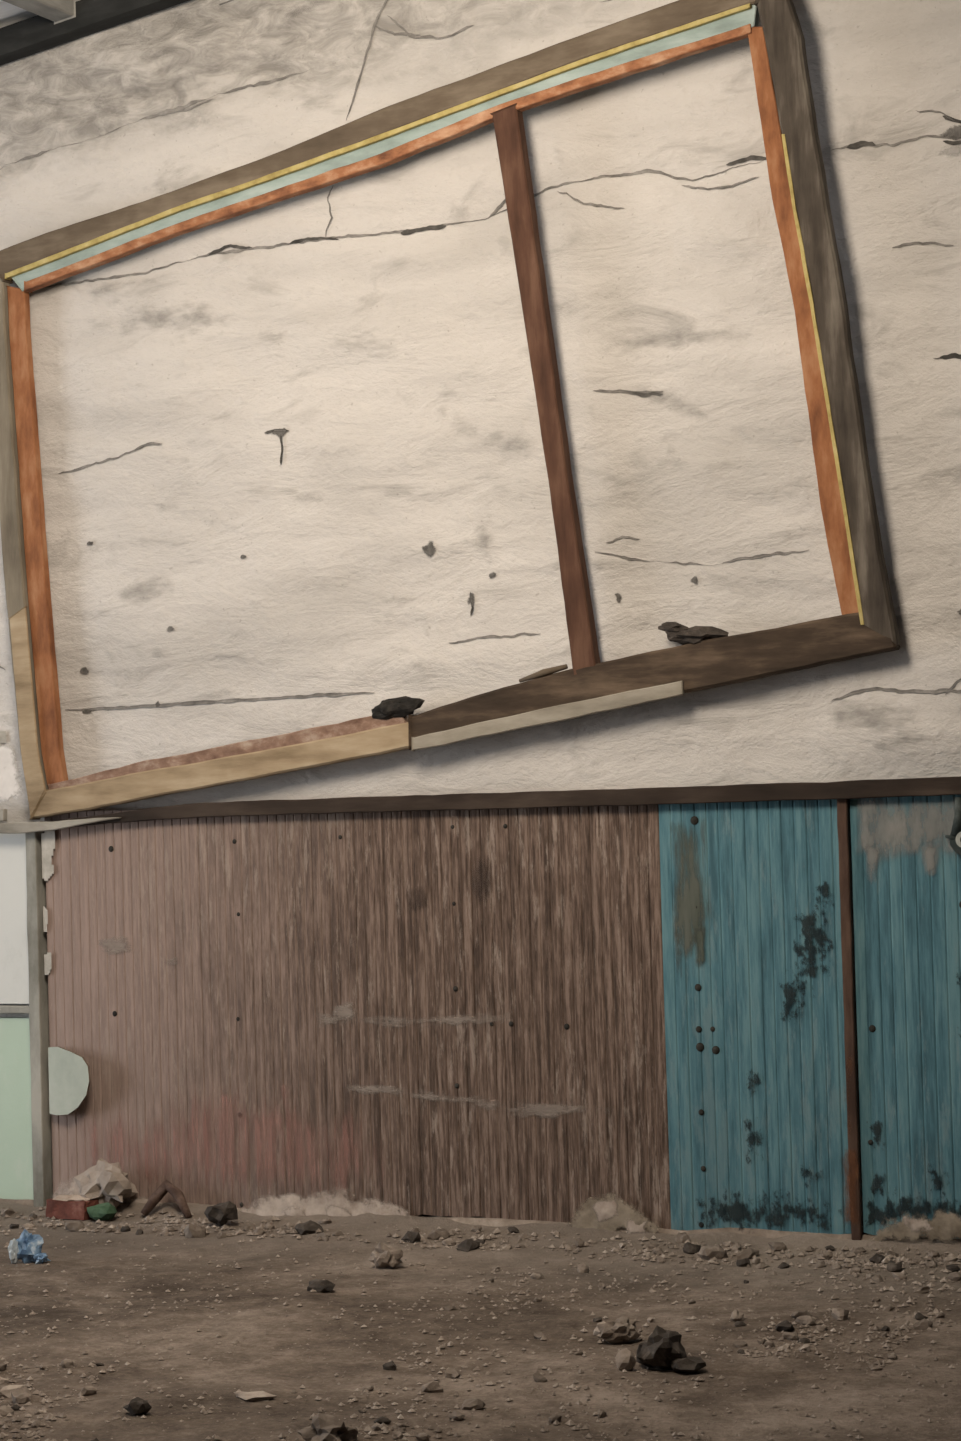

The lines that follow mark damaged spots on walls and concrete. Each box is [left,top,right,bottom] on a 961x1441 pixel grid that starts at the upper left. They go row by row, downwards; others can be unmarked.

crack [346,0,473,121]
crack [44,155,766,288]
crack [451,633,538,644]
crack [65,692,372,710]
peeling [0,731,20,800]